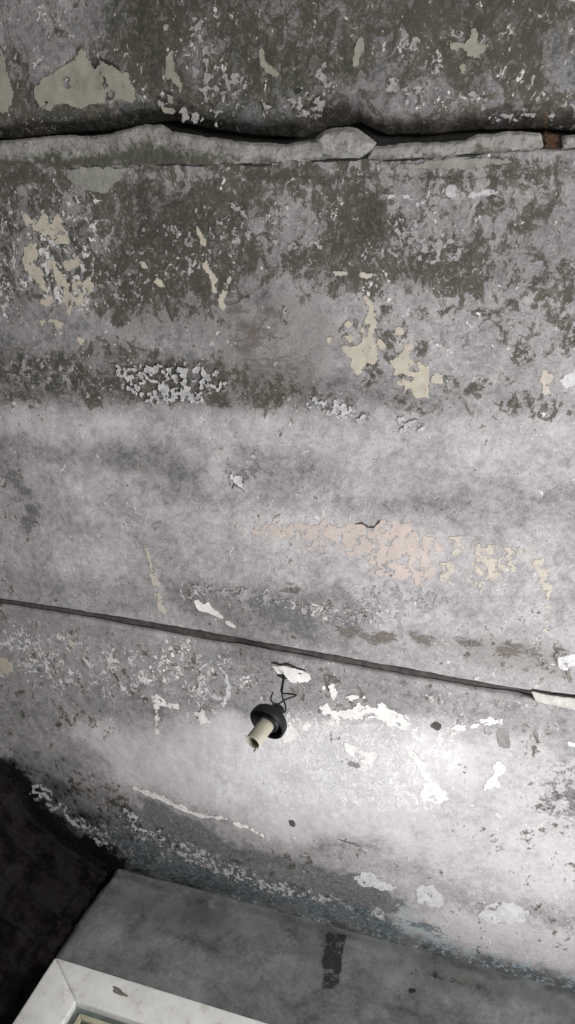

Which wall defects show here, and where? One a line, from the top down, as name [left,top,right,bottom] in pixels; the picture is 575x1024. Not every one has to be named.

peeling [34,48,135,111]
crack [0,128,130,141]
crack [139,161,211,169]
crack [155,121,575,167]
water stain [136,180,214,255]
water stain [300,174,498,242]
peeling [21,189,254,329]
peeling [0,346,227,407]
water stain [226,301,309,380]
peeling [326,296,443,399]
peeling [319,683,410,768]
water stain [138,796,292,867]